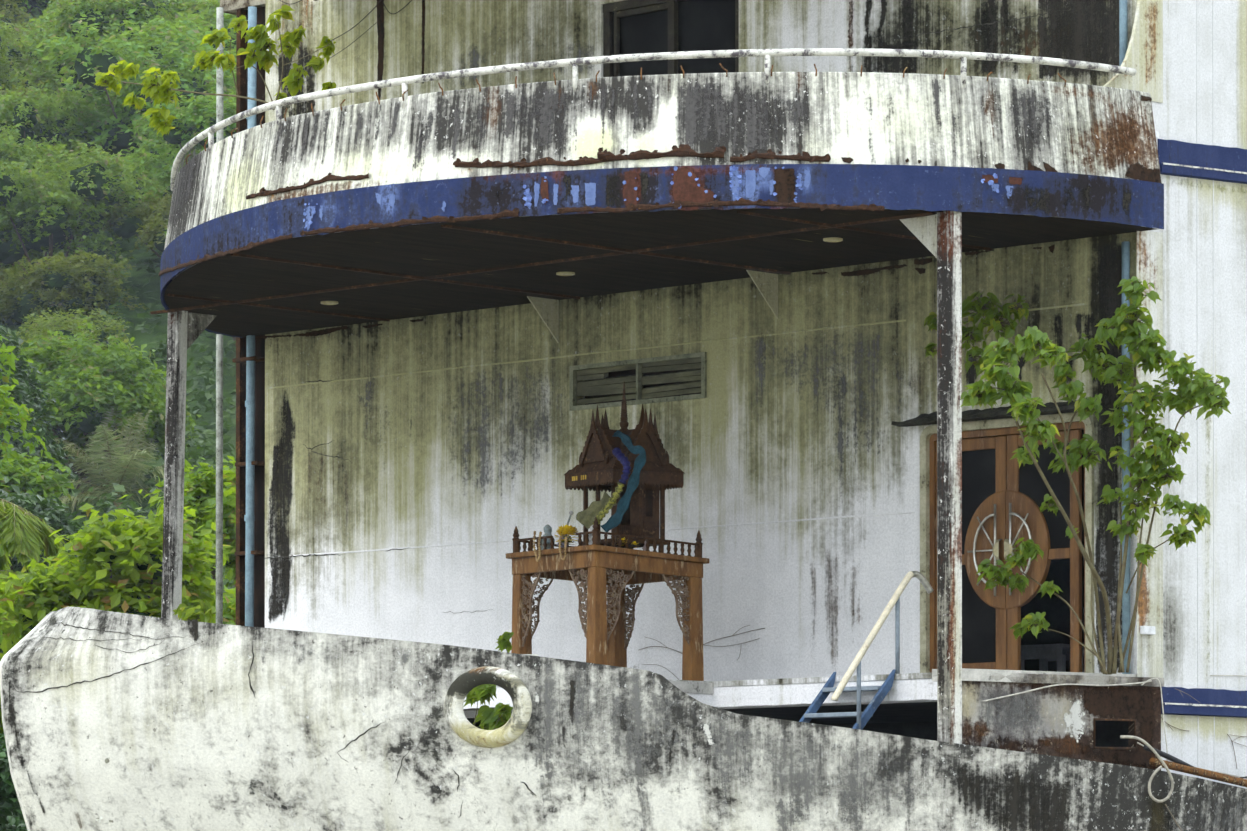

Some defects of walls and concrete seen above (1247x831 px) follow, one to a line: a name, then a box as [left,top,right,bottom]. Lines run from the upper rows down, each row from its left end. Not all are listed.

damp [274,46,401,175]
peeling [522,176,596,209]
peeling [622,170,639,210]
rust [453,144,853,171]
peeling [670,166,811,209]
rust [1089,95,1161,183]
damp [1051,244,1122,673]
damp [267,391,295,622]
crack [14,620,199,693]
rust [962,720,991,739]
rust [1040,687,1157,769]
damp [950,763,1073,831]